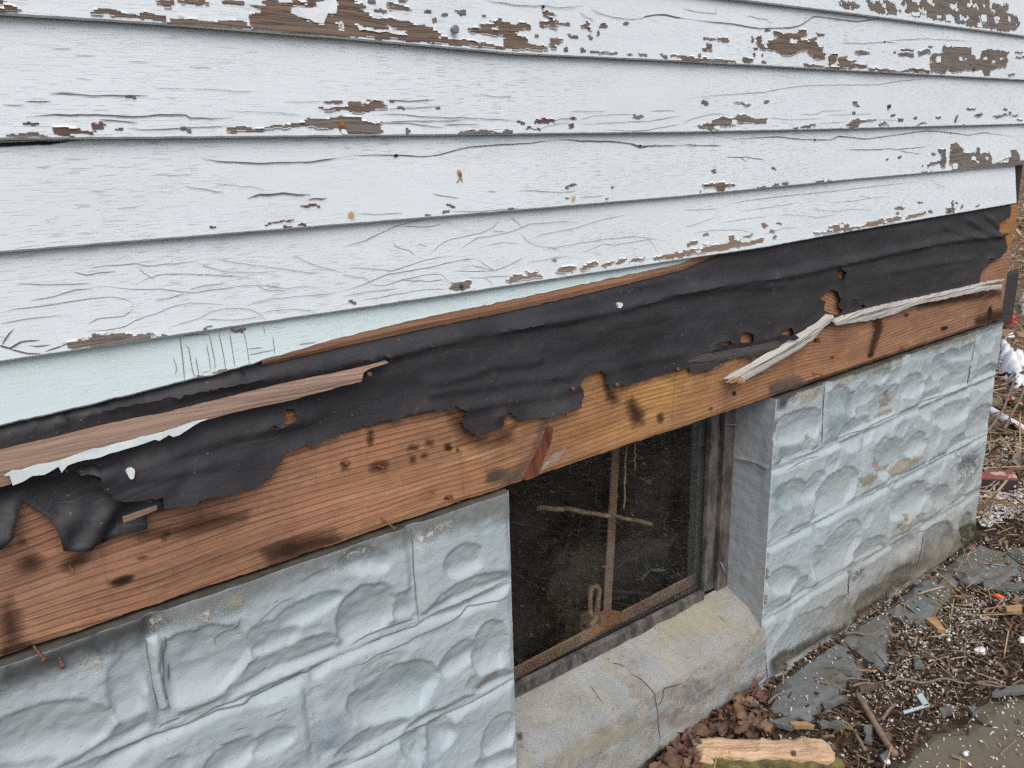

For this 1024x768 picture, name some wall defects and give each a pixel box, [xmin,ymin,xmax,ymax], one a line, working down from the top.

peeling [90,0,647,57]
peeling [838,0,1020,32]
peeling [660,28,1024,77]
peeling [6,121,123,138]
peeling [227,99,405,135]
peeling [921,142,1024,173]
peeling [551,222,782,274]
crack [0,190,658,380]
peeling [62,332,167,349]
leakage [264,535,338,560]
leakage [111,575,132,585]
leakage [0,611,163,685]